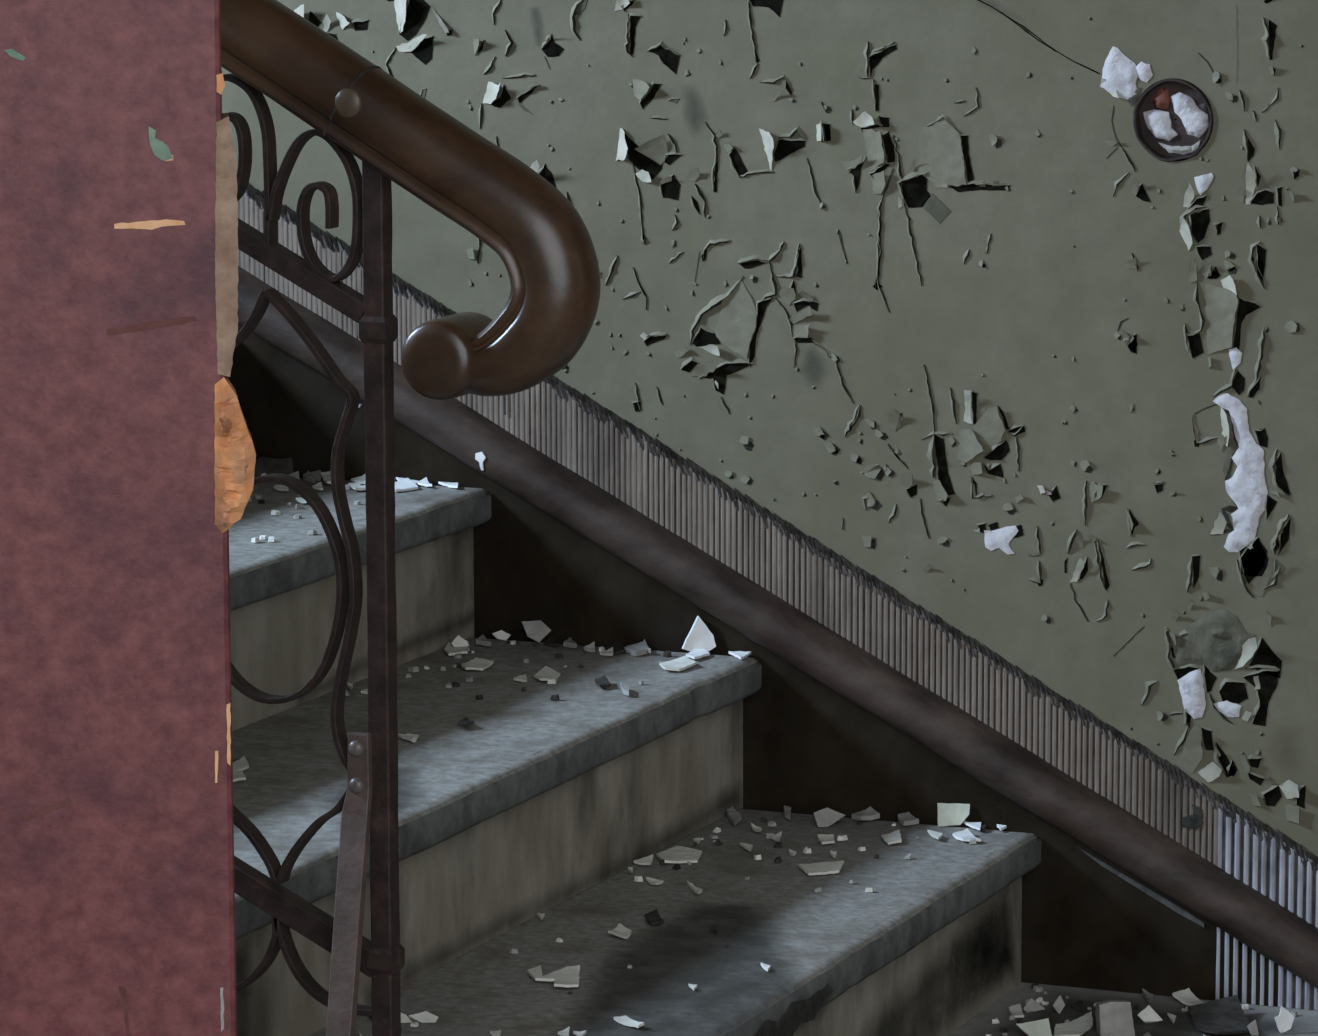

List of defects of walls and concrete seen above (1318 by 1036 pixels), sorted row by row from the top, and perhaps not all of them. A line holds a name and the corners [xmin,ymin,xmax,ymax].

peeling [294,4,368,40]
peeling [385,0,453,76]
peeling [466,0,564,129]
peeling [614,0,701,77]
peeling [616,79,706,244]
peeling [723,101,832,178]
peeling [840,41,1010,285]
spalling [1100,46,1153,106]
peeling [674,241,819,414]
peeling [888,365,1026,554]
spalling [1163,129,1306,823]
peeling [660,616,716,671]